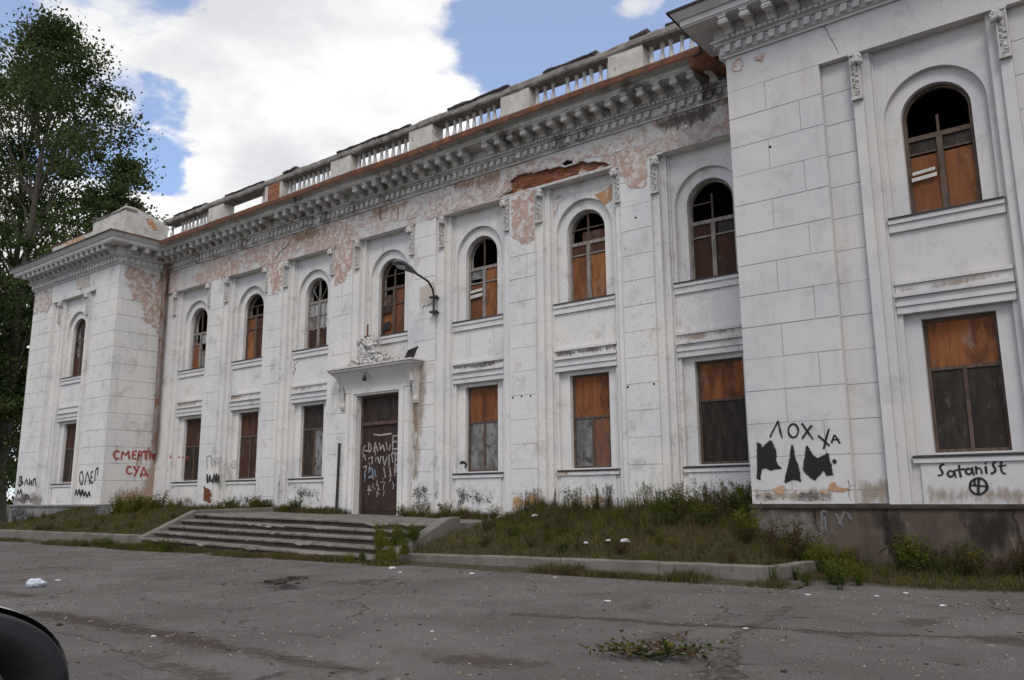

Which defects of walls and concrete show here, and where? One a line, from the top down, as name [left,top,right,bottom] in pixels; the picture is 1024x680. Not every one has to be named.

peeling [214,120,723,295]
peeling [125,265,166,333]
leakage [413,365,438,510]